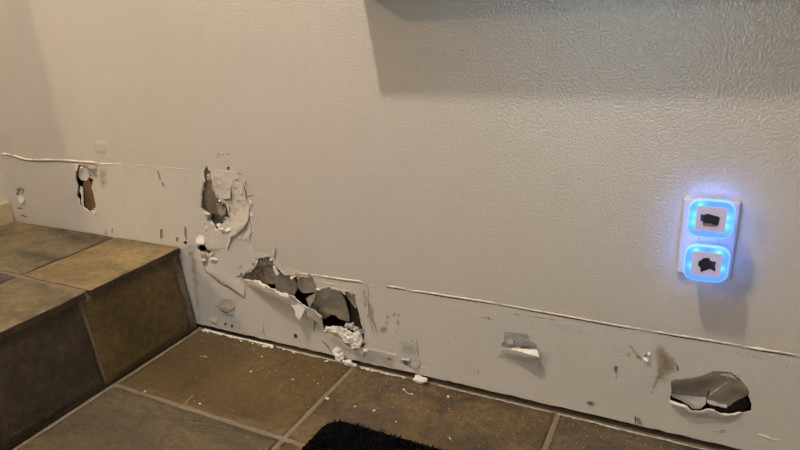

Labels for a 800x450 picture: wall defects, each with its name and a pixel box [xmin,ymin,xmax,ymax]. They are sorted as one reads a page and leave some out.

peeling [291,303,305,320]
spalling [501,332,539,357]